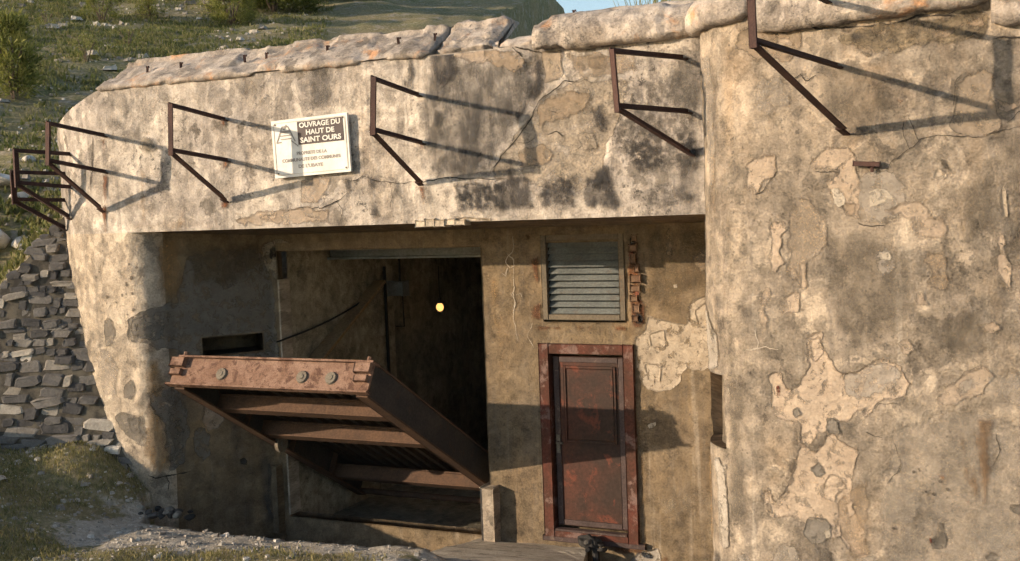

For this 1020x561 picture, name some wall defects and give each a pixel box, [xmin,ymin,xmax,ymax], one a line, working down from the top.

crack [235,80,594,221]
water stain [428,54,619,212]
peeling [746,154,776,195]
peeling [810,146,946,238]
crack [886,111,1020,171]
peeling [104,318,115,346]
peeling [127,239,289,358]
peeling [616,234,718,392]
peeling [123,380,135,400]
peeling [115,412,147,446]
peeling [149,387,190,471]
spalling [762,331,909,555]